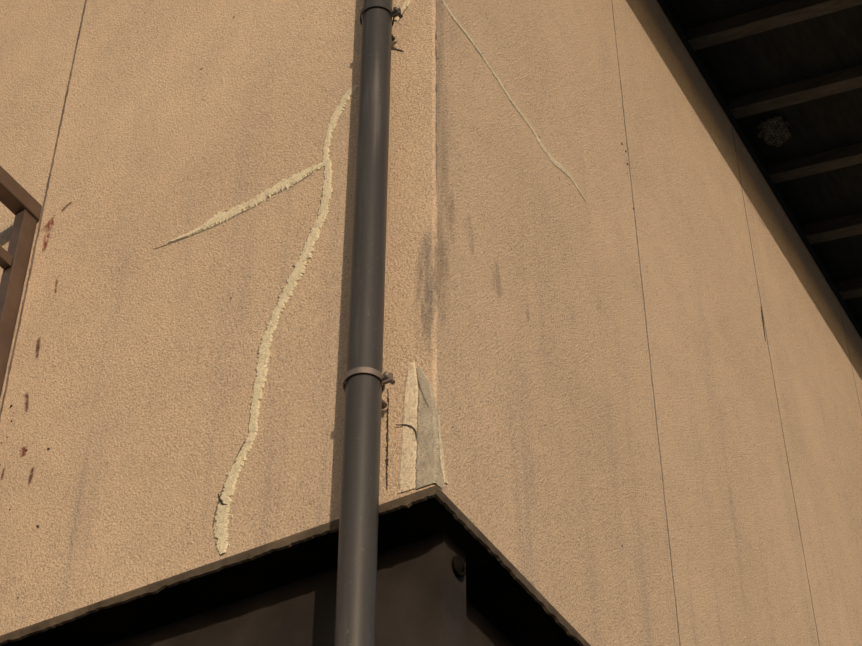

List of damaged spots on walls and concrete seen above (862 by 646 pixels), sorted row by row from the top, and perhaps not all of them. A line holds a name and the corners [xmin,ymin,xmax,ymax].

crack [394,0,410,22]
crack [435,0,586,202]
crack [154,84,359,555]